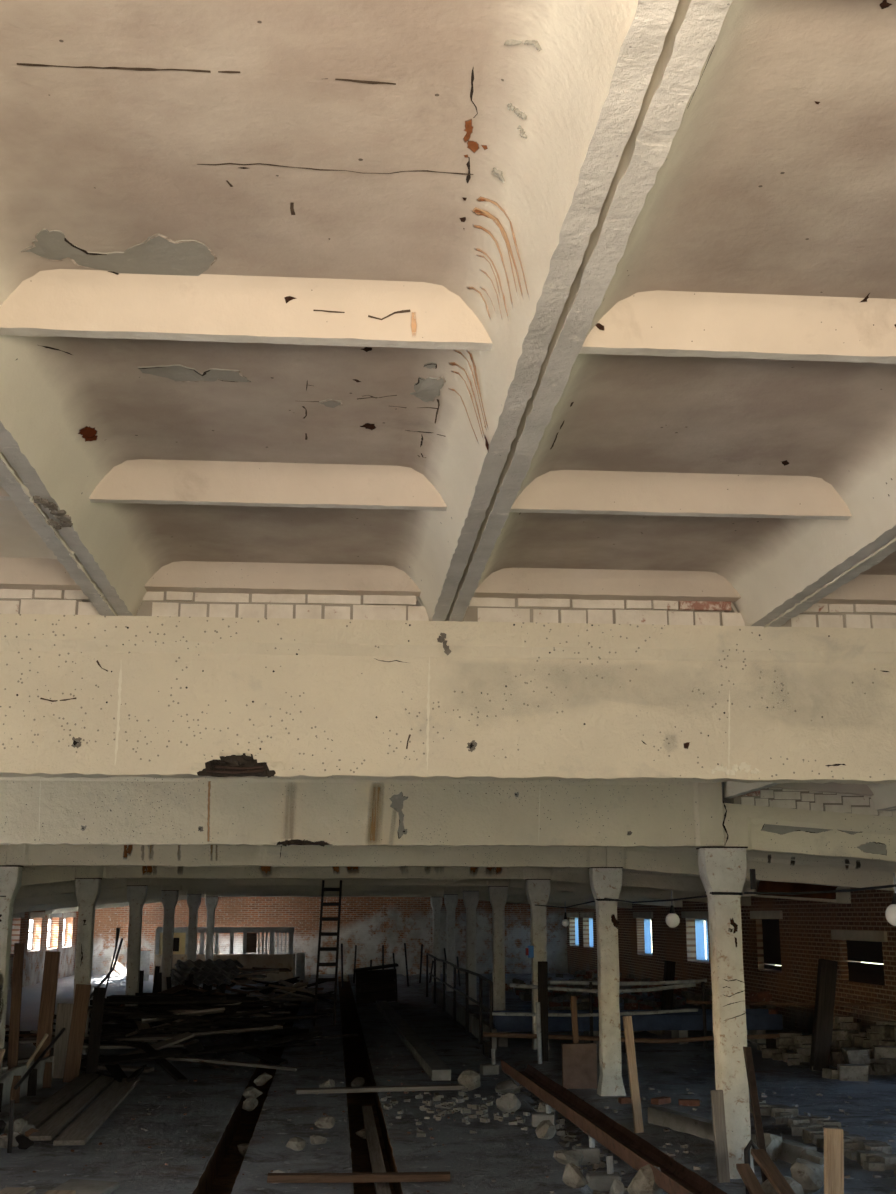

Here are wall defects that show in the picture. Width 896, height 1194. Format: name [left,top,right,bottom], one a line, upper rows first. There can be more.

crack [17,63,240,73]
crack [326,77,396,85]
corrosion [463,66,488,183]
crack [197,163,505,187]
peeling [21,229,217,276]
corrosion [469,197,528,318]
peeling [410,362,446,403]
corrosion [450,350,489,450]
spalling [190,749,284,778]
peeling [389,792,408,839]
crack [721,801,729,844]
peeling [761,824,887,855]